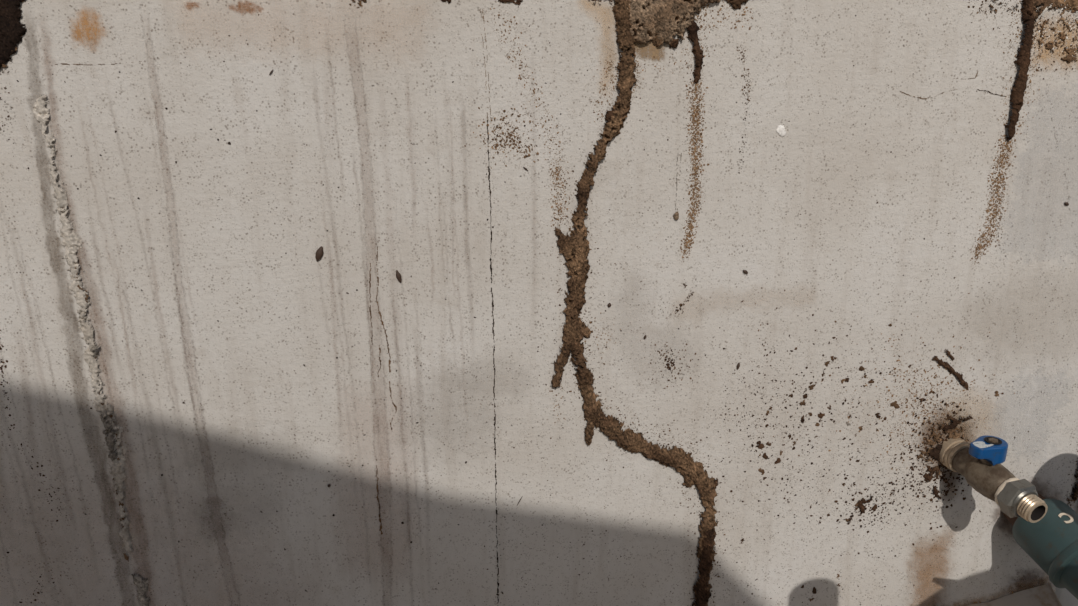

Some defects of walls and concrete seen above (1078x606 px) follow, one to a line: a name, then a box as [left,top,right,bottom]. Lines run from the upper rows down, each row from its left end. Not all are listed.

crack [479,9,499,602]